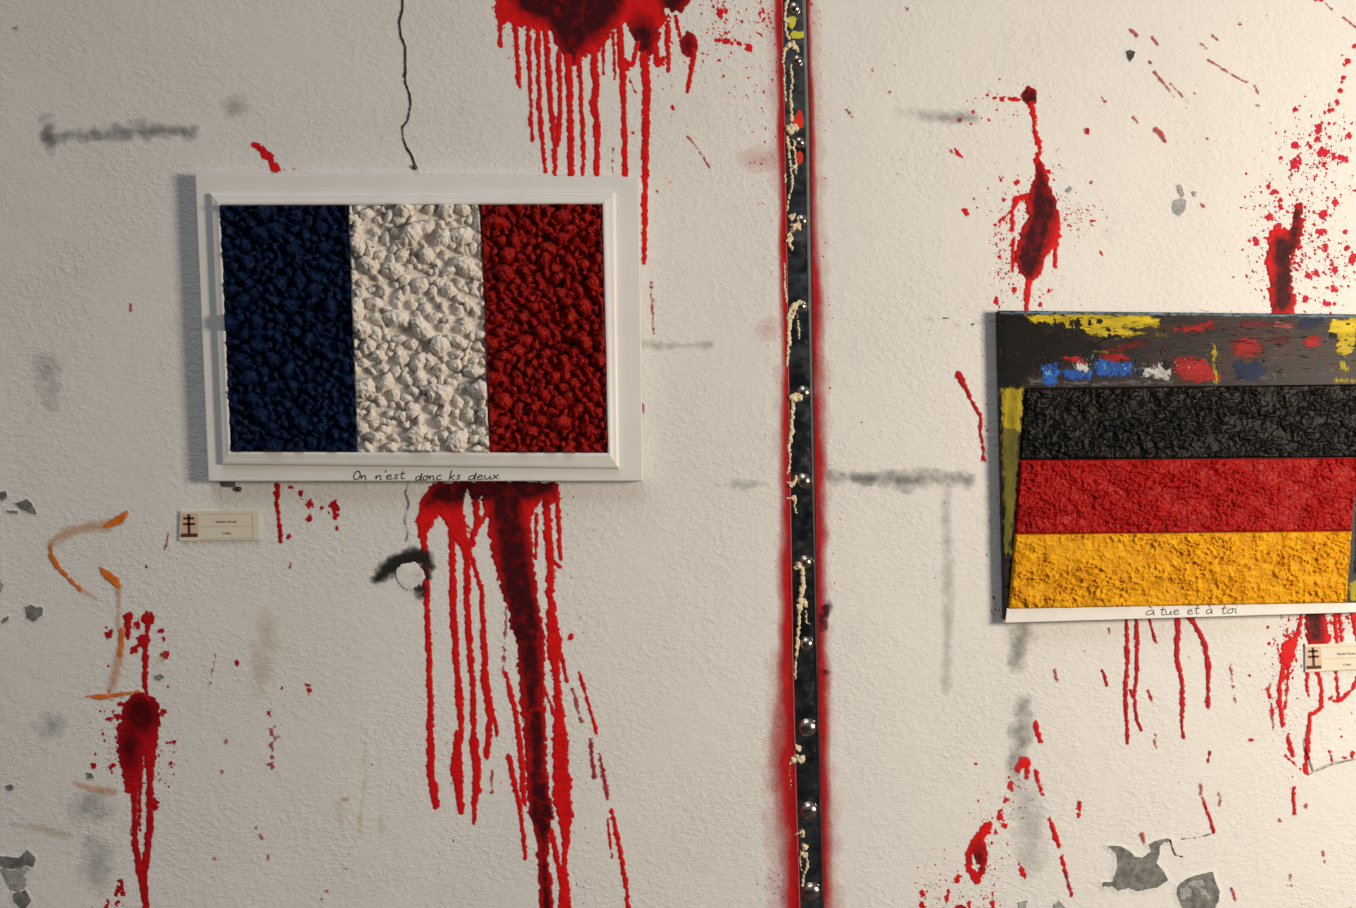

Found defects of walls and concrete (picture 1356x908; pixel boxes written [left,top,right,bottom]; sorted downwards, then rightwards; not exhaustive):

crack [398,0,416,165]
peeling [0,846,39,908]
spalling [1097,833,1224,908]